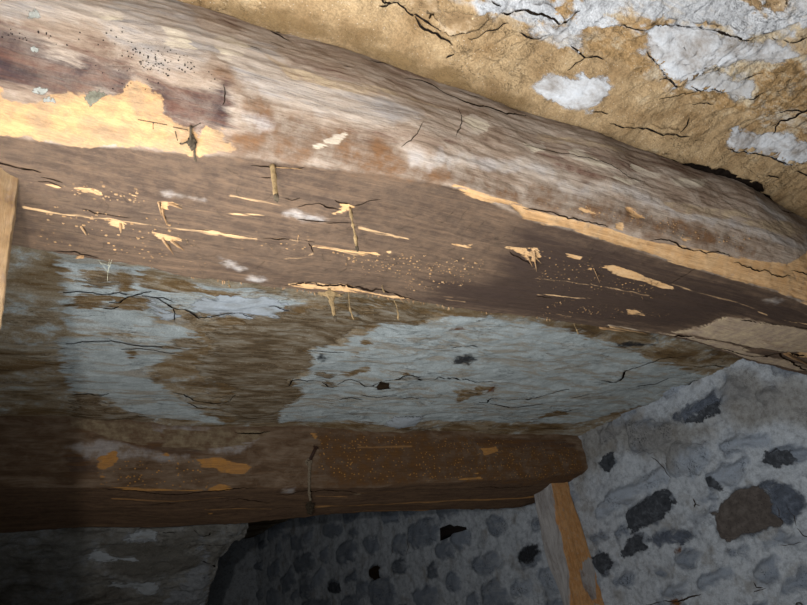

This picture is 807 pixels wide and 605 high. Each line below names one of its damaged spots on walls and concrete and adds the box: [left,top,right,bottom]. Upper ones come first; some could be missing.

crack [380,0,580,58]
crack [623,19,807,43]
crack [567,43,603,71]
crack [596,51,725,138]
crack [727,109,807,178]
crack [525,145,645,182]
crack [529,208,607,227]
crack [63,290,254,320]